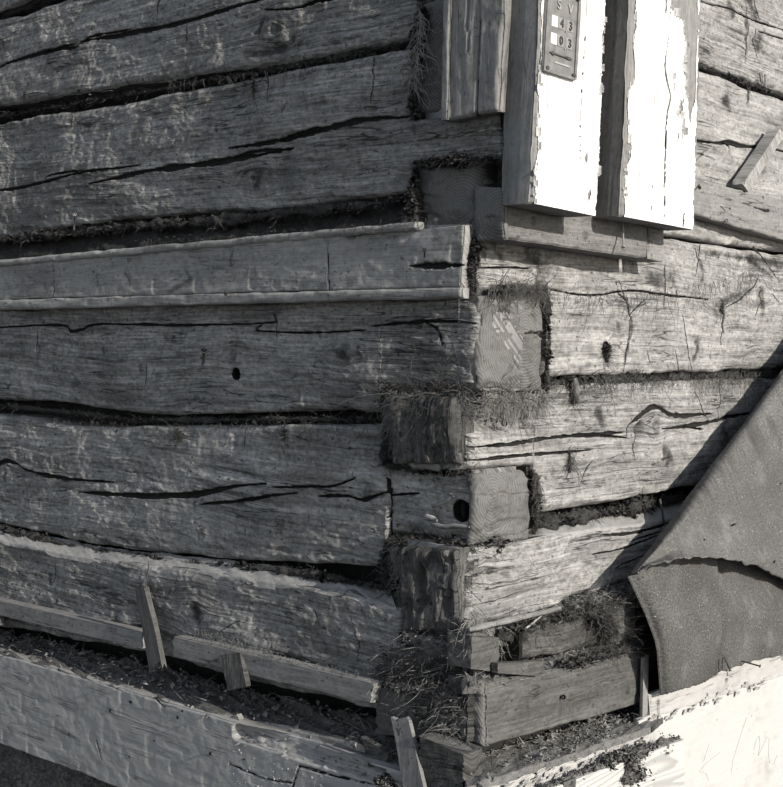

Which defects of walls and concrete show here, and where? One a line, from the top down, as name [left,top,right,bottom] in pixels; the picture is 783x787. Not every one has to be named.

crack [0,0,332,68]
peeling [599,17,607,96]
peeling [672,8,690,139]
crack [702,2,783,40]
crack [0,116,409,191]
crack [550,283,708,312]
crack [0,314,475,345]
crack [471,404,749,461]
crack [0,459,420,538]
crack [592,522,669,568]
crack [231,764,373,787]